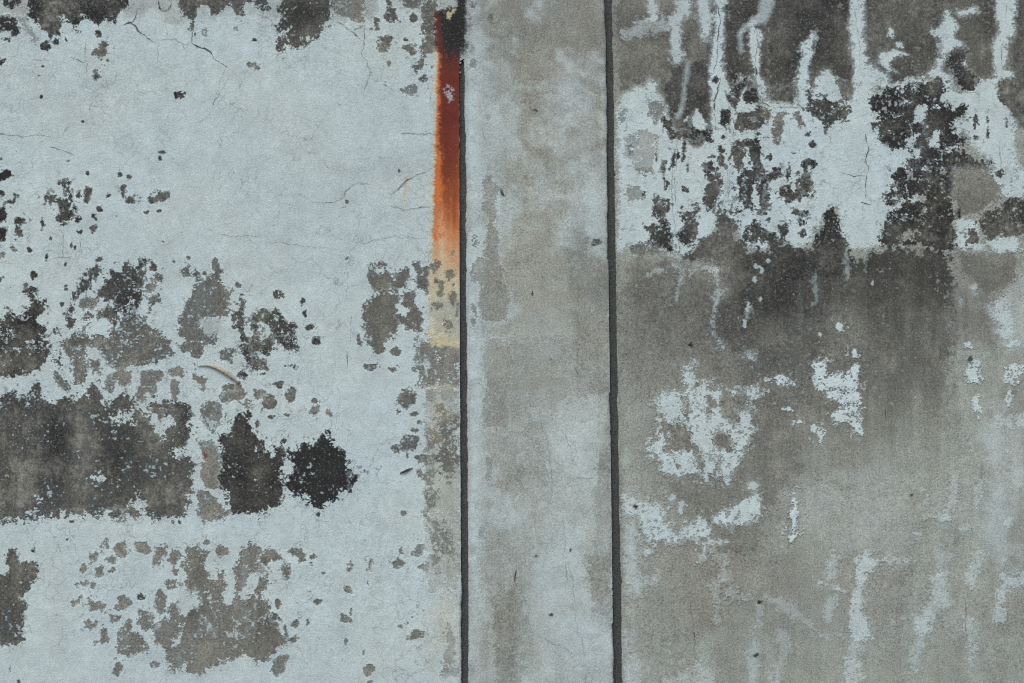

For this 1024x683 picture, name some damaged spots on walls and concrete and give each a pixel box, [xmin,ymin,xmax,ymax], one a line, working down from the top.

peeling [155,147,168,163]
peeling [169,88,191,103]
rust [424,0,467,351]
damp [464,0,500,72]
peeling [614,0,1024,256]
peeling [0,156,370,683]
peeling [353,256,460,480]
damp [559,0,1024,683]
peeling [953,218,1024,427]
peeling [338,538,431,683]
damp [489,582,522,683]